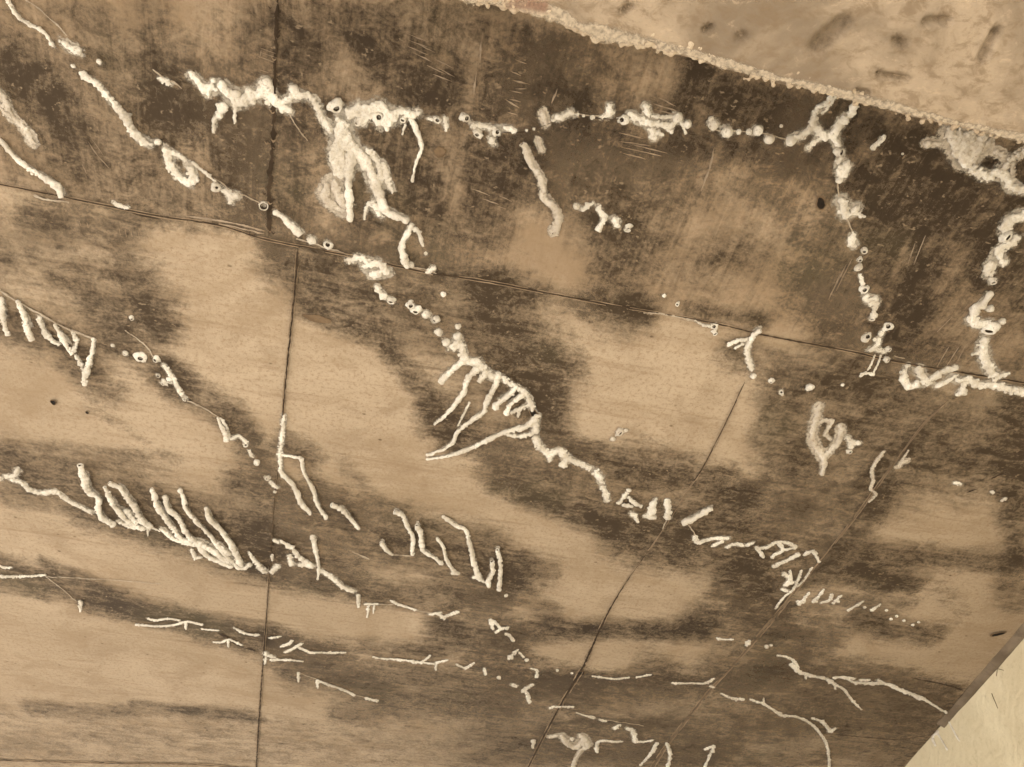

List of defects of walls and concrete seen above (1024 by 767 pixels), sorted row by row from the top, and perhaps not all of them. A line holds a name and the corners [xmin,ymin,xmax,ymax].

damp [0,138,66,198]
damp [730,177,789,211]
damp [0,195,774,767]
damp [811,589,947,647]